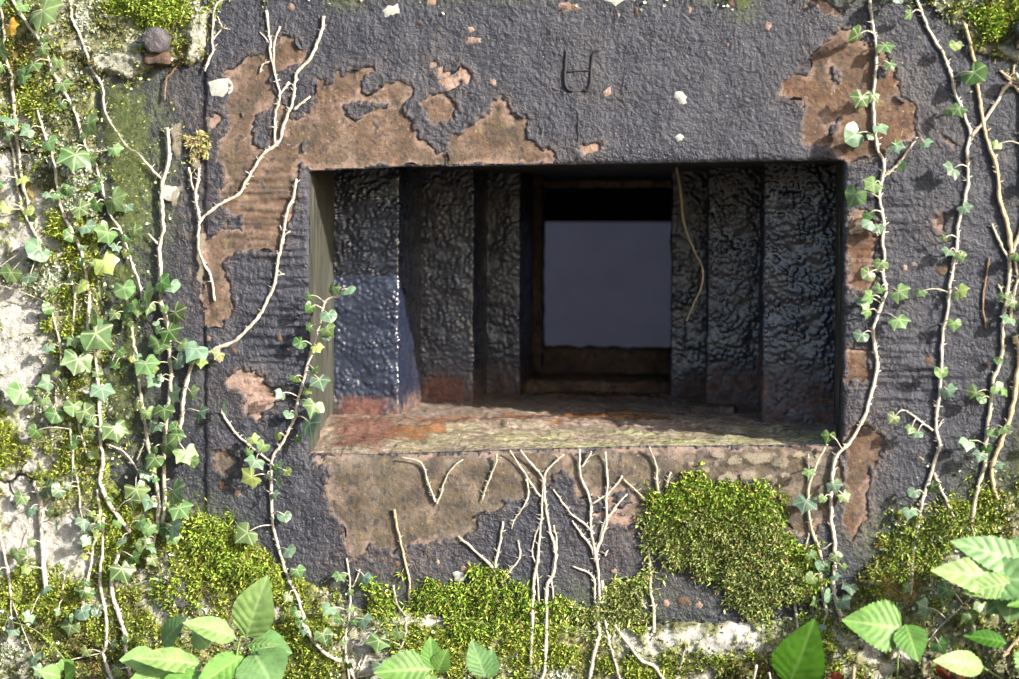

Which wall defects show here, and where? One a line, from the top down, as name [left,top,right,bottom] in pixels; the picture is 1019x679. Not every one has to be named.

peeling [466,27,481,44]
peeling [778,29,917,163]
peeling [200,37,555,341]
peeling [226,368,276,420]
rust [335,397,679,448]
peeling [314,427,883,566]